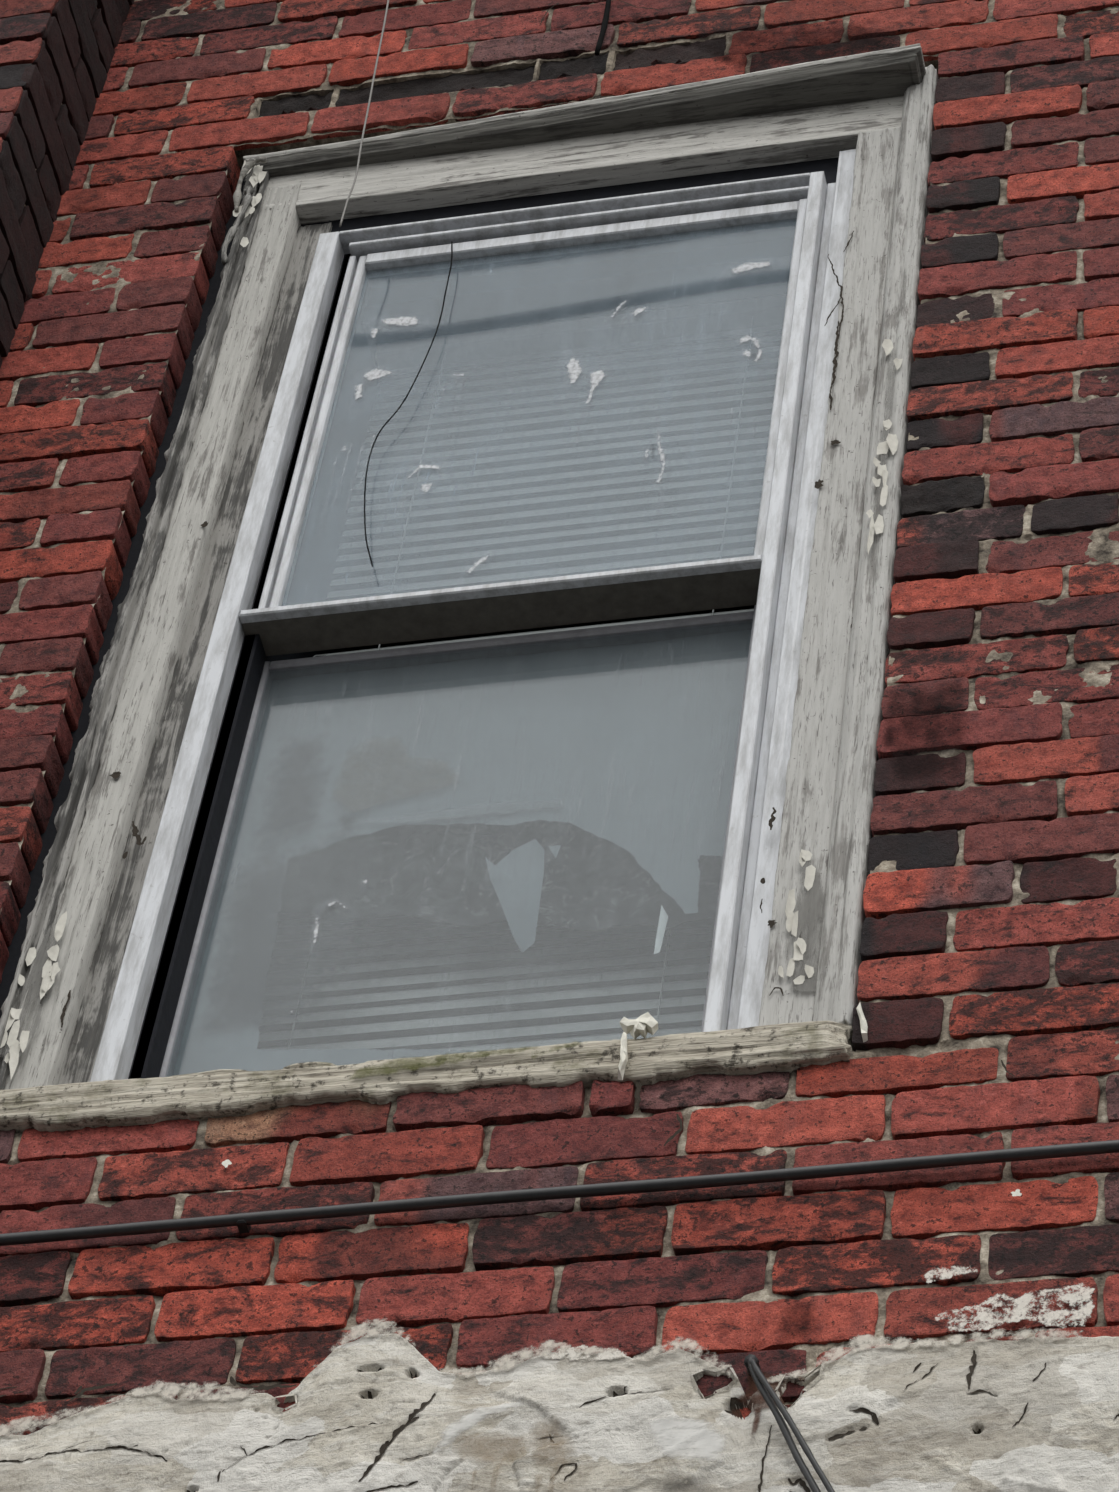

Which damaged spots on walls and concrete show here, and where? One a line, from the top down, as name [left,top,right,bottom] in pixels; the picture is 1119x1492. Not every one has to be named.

peeling [778,849,825,992]
peeling [0,911,67,1079]
crack [0,1441,167,1462]
crack [230,1376,297,1390]
peeling [271,1393,297,1412]
crack [217,1393,436,1492]
peeling [690,1367,739,1399]
crack [758,1425,810,1492]
peeling [775,1364,825,1408]
crack [828,1407,879,1441]
crack [903,1350,1046,1427]